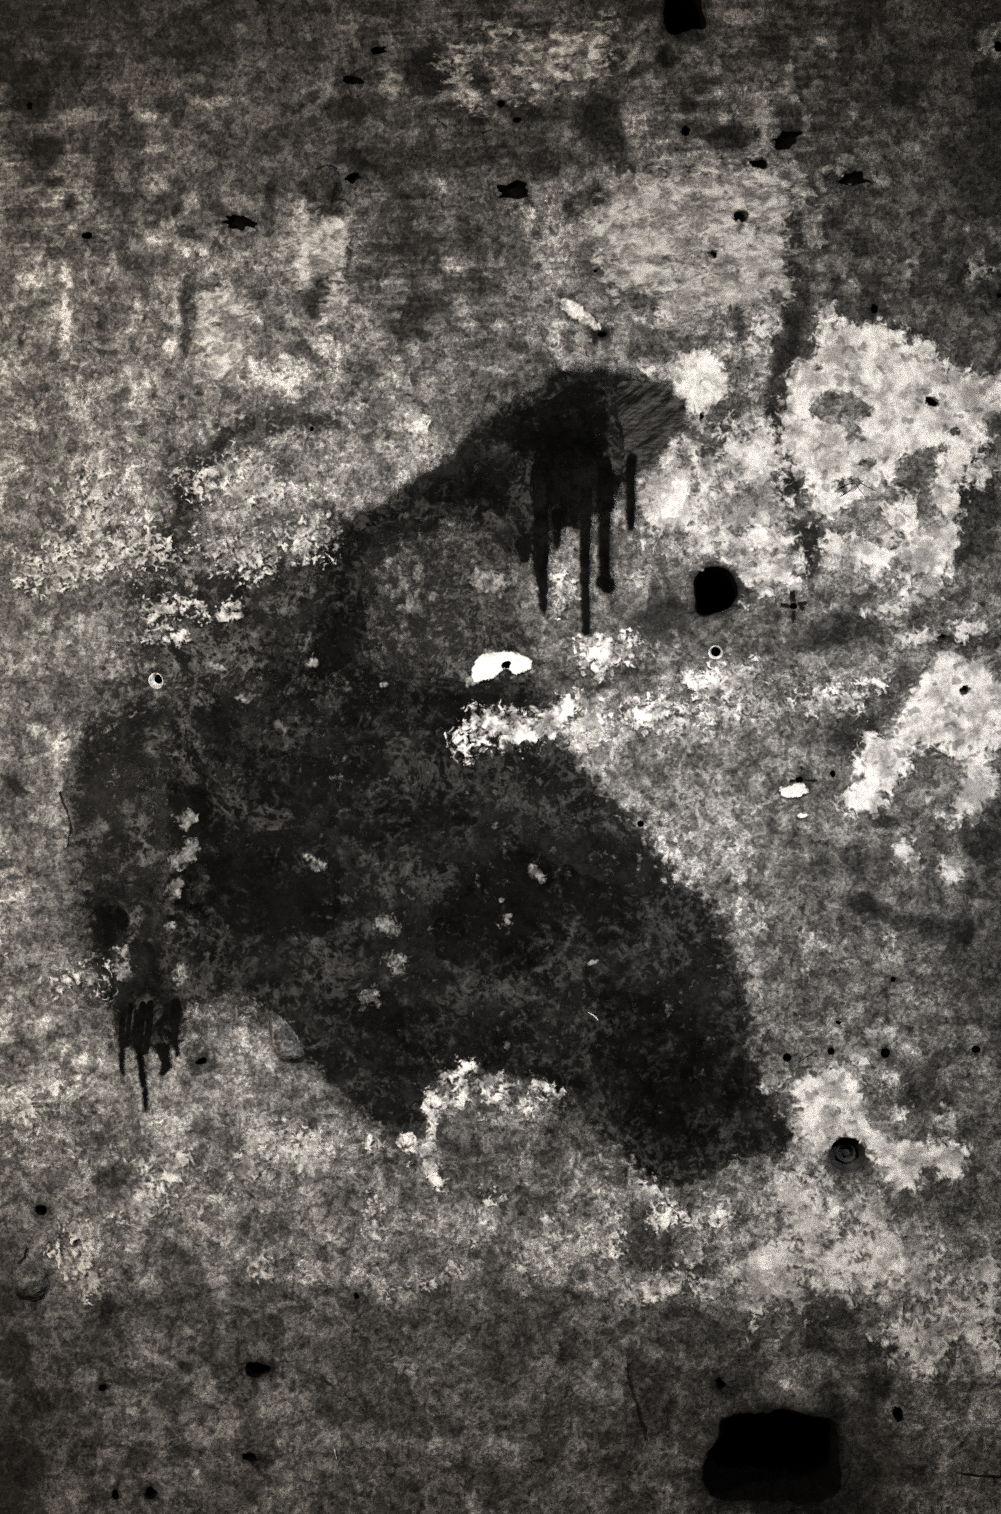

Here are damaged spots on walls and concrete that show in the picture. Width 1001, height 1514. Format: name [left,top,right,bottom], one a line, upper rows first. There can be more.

water stain [11,393,892,1306]
water stain [488,363,613,512]